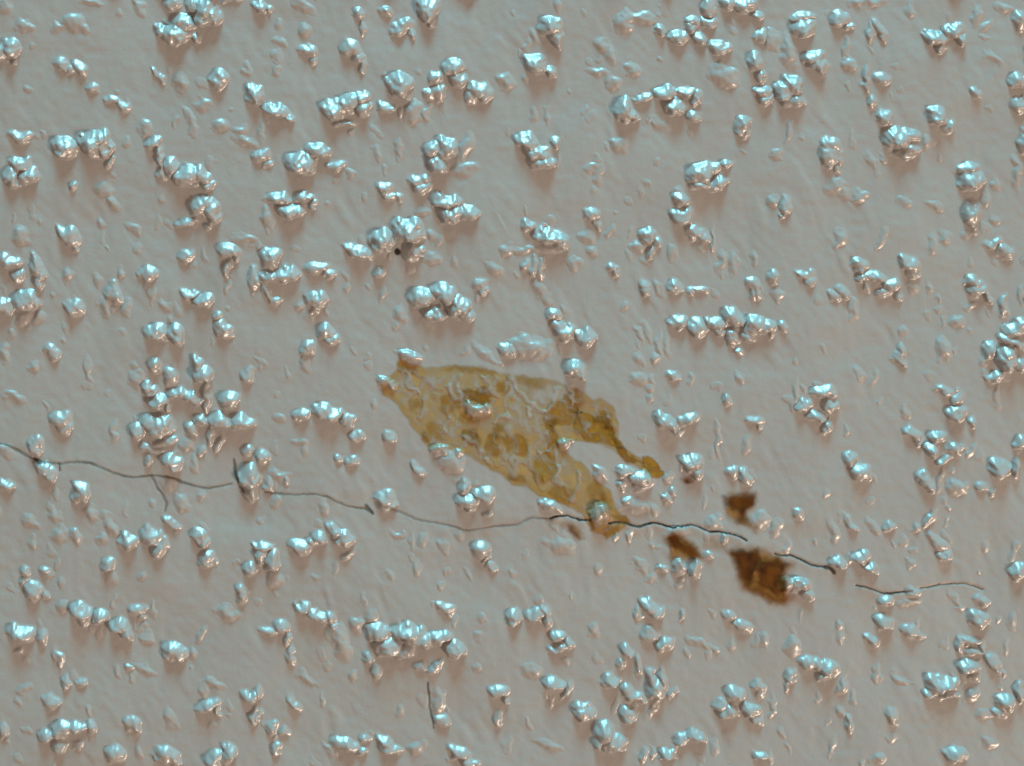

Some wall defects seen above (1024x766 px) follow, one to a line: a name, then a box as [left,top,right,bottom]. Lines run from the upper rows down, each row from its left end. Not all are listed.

crack [15,449,95,469]
leakage [382,359,664,537]
crack [121,475,188,484]
rust [727,495,754,522]
crack [550,515,747,541]
rust [667,535,699,559]
rust [729,549,789,603]
crack [774,553,983,594]